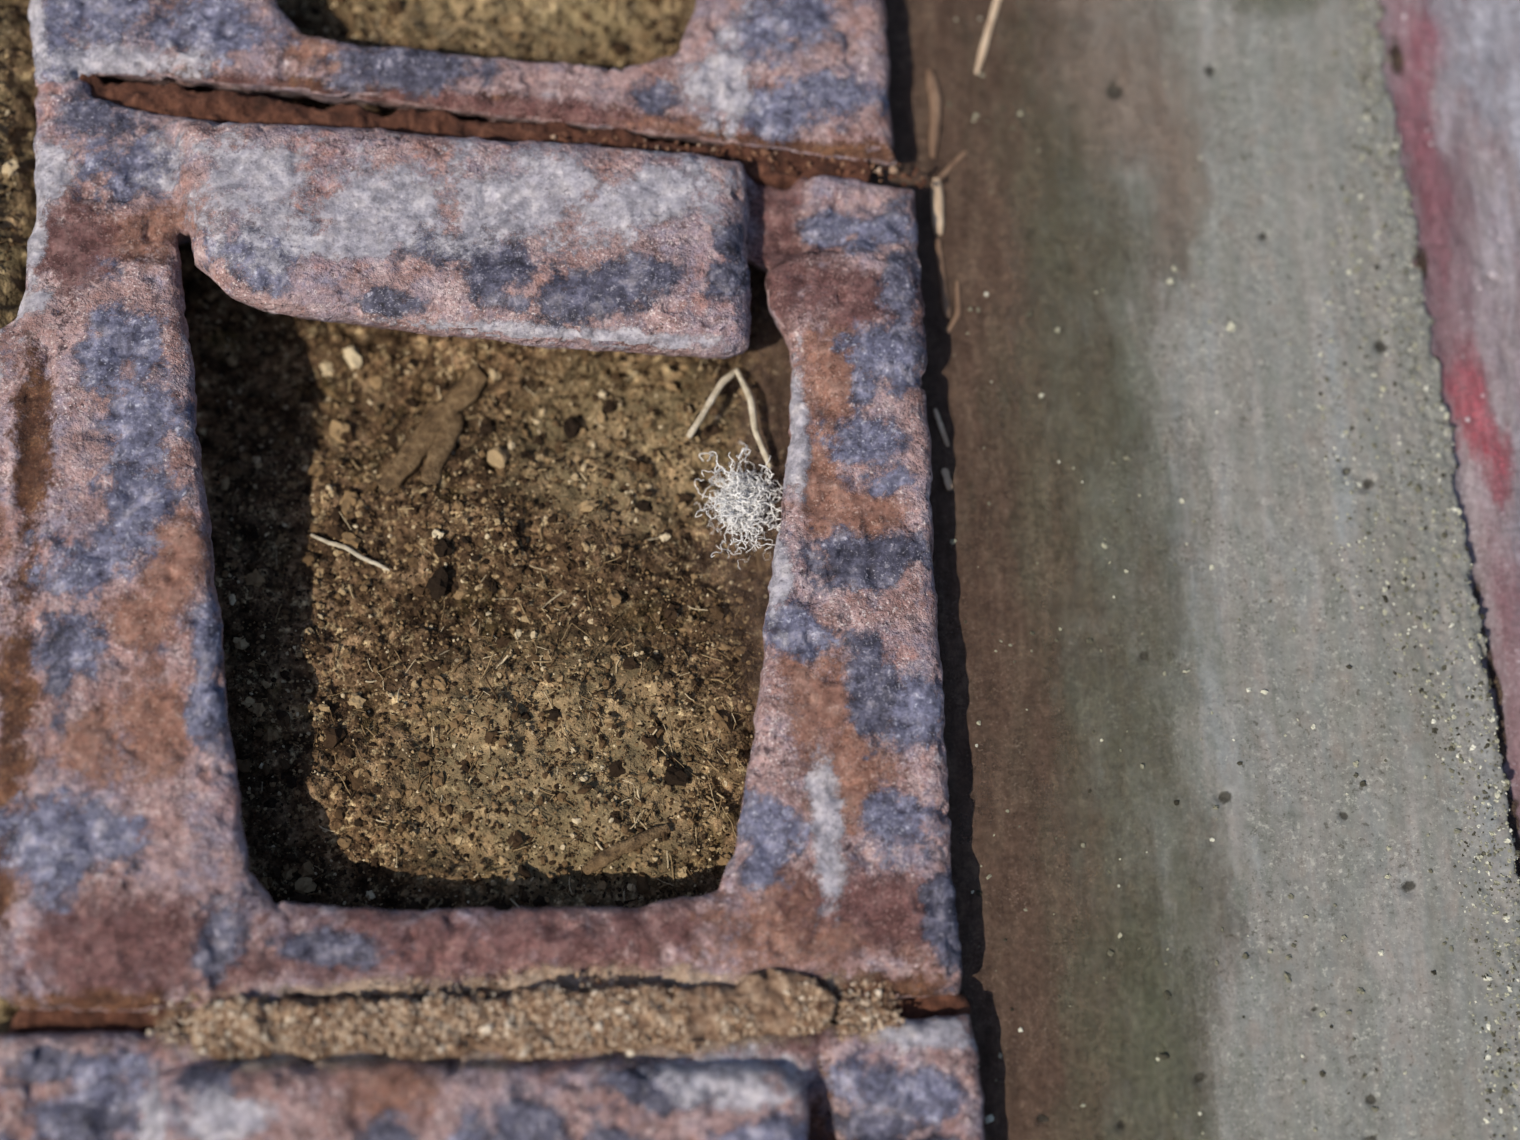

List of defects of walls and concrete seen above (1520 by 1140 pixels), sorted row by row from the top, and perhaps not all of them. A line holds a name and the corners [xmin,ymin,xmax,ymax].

corrosion [0,0,1193,1140]